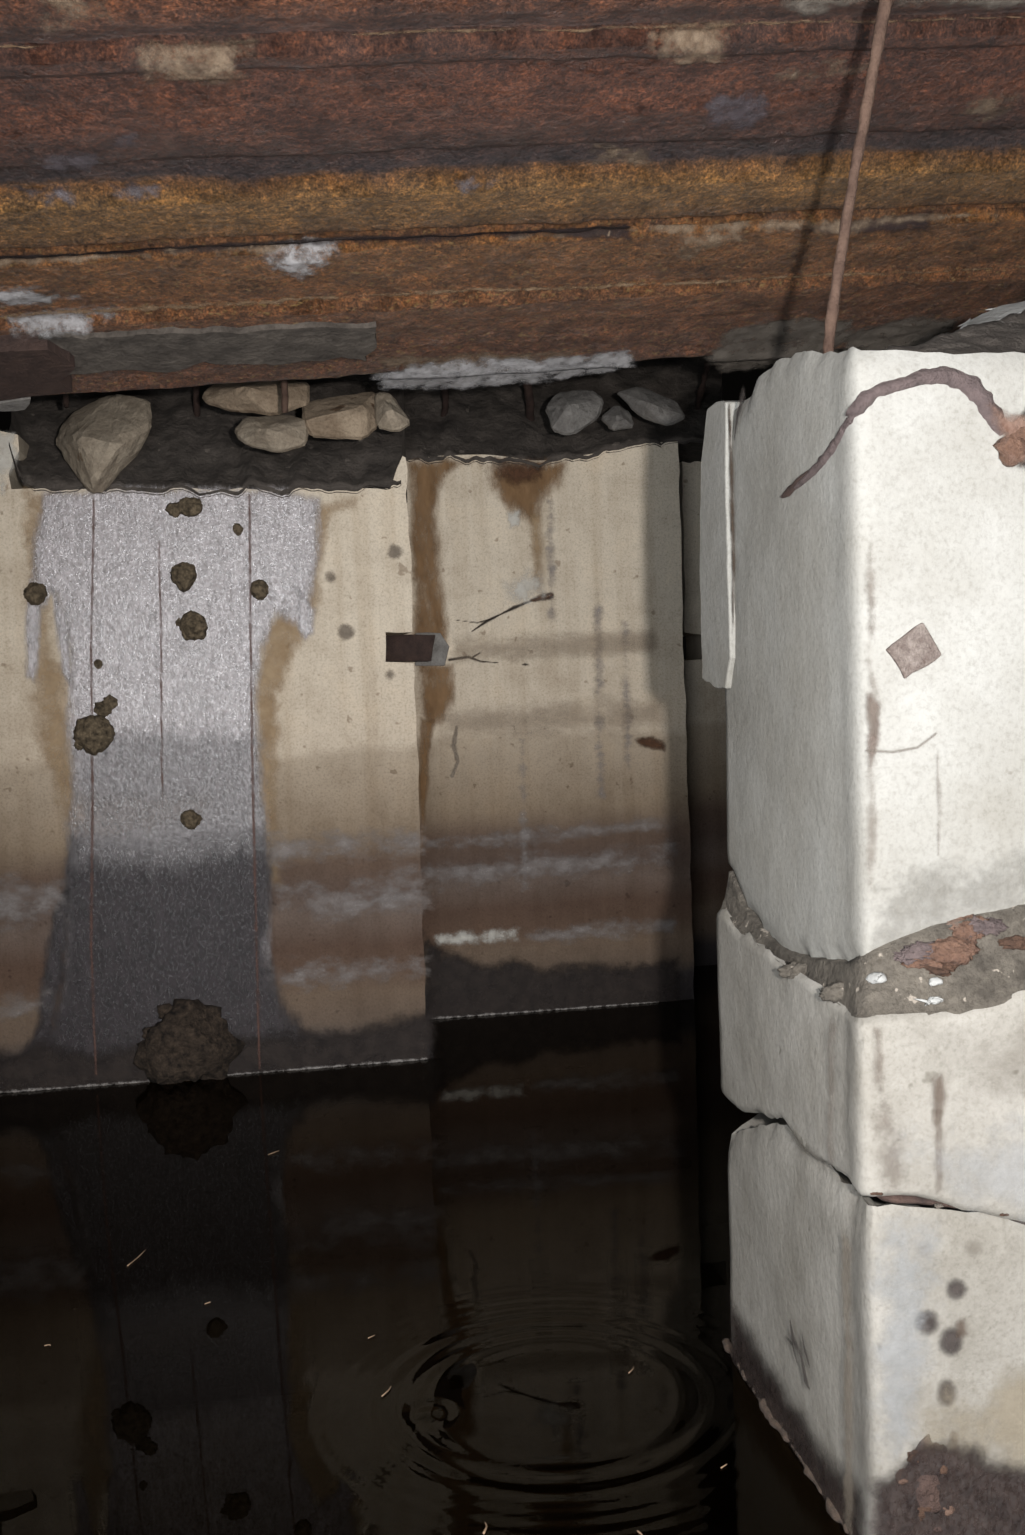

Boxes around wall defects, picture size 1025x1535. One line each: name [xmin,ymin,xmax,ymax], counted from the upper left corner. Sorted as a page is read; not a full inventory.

corrosion [148,40,255,82]
corrosion [539,20,832,64]
corrosion [765,220,802,229]
corrosion [0,254,120,265]
corrosion [373,265,1025,296]
spalling [993,412,1025,467]
corrosion [410,460,456,639]
corrosion [493,460,564,584]
corrosion [419,666,453,848]
water stain [0,489,680,1092]
crack [870,1192,1025,1225]
water stain [730,1310,1025,1535]